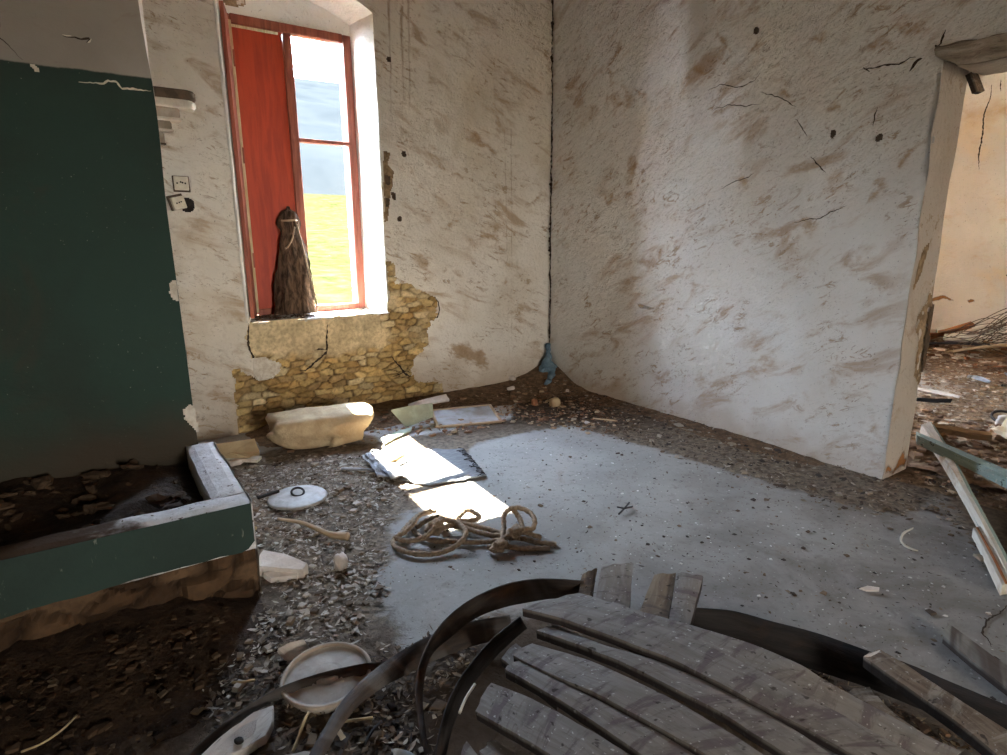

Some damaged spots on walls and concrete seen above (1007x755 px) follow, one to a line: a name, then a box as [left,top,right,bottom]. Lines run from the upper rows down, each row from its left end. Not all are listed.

crack [81,80,148,91]
crack [978,82,1001,166]
flaking render [383,151,394,222]
flaking render [232,261,443,434]
flaking render [914,293,951,385]
crack [981,605,1007,646]